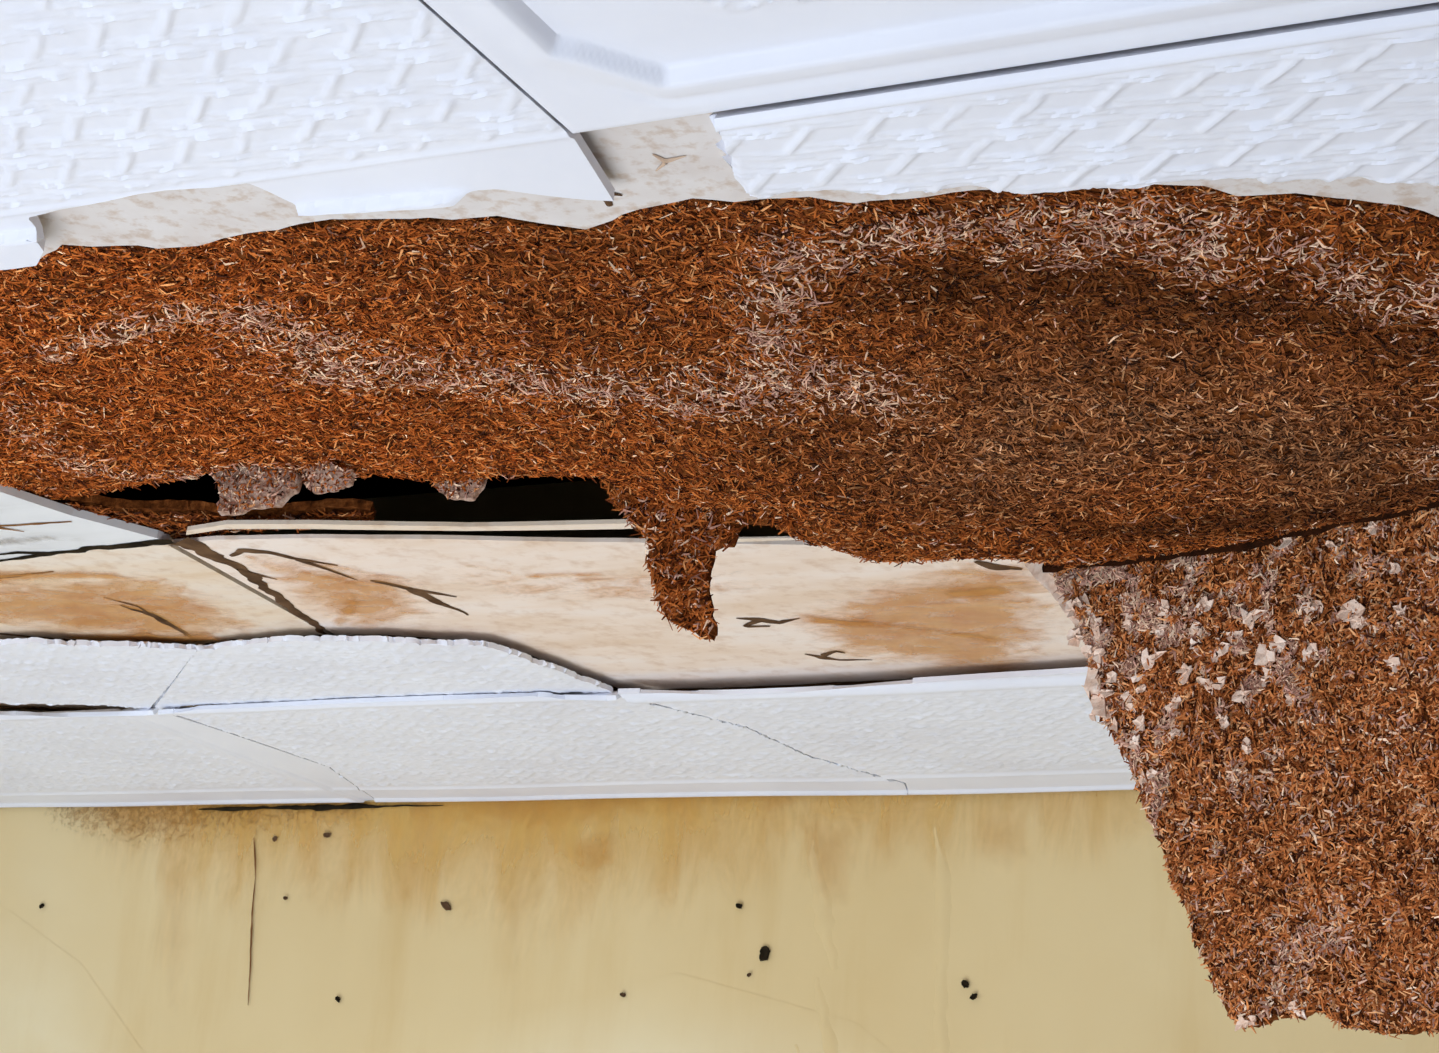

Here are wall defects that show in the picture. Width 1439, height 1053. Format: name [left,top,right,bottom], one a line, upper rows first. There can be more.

peeling [0,184,1439,642]
leakage [0,573,215,641]
crack [0,521,468,645]
leakage [277,570,406,621]
leakage [812,571,1026,663]
crack [0,704,97,712]
crack [668,679,913,691]
spalling [805,650,858,661]
peeling [1065,592,1171,750]
peeling [1165,596,1287,740]
peeling [1384,654,1401,673]
leakage [190,796,753,867]